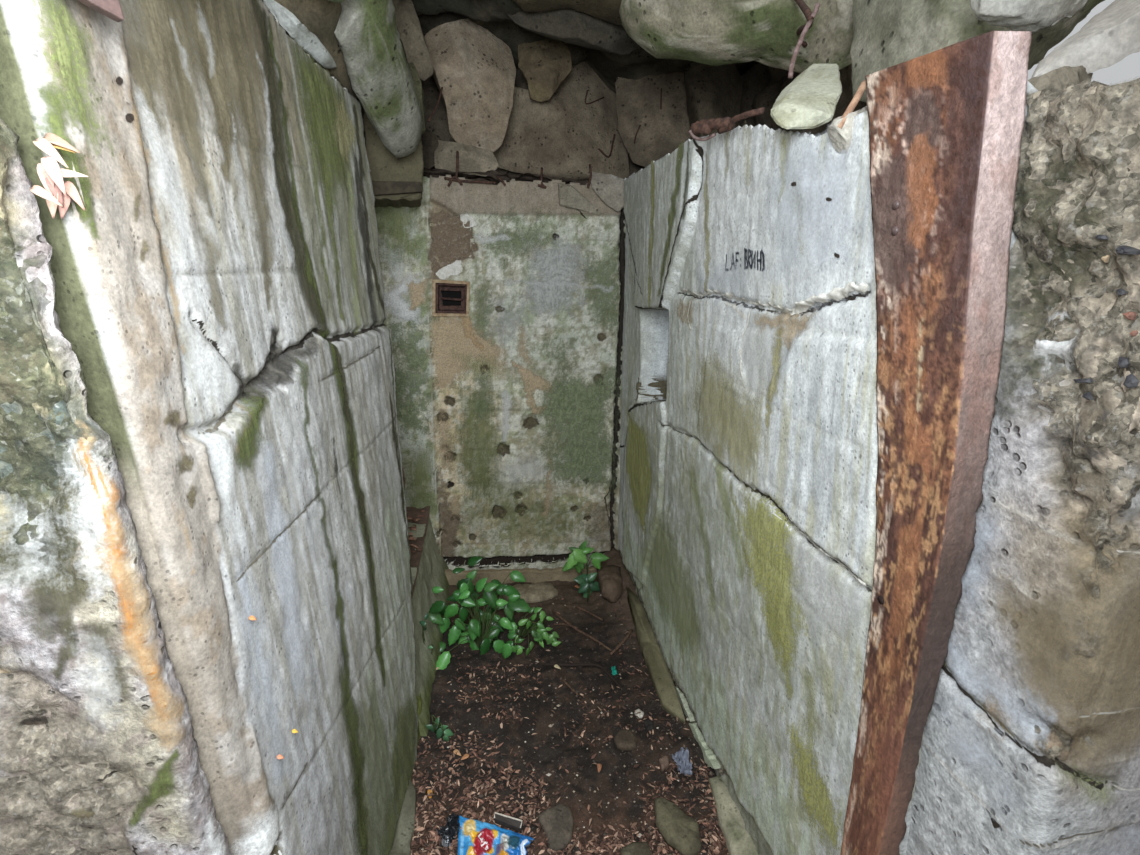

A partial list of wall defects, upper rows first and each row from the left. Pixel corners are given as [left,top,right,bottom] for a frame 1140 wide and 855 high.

crack [192,319,251,434]
leakage [124,0,461,855]
crack [280,324,385,381]
crack [443,139,872,592]
rust [75,428,183,745]
leakage [716,461,747,627]
crack [942,662,1107,790]
leakage [1001,590,1140,792]